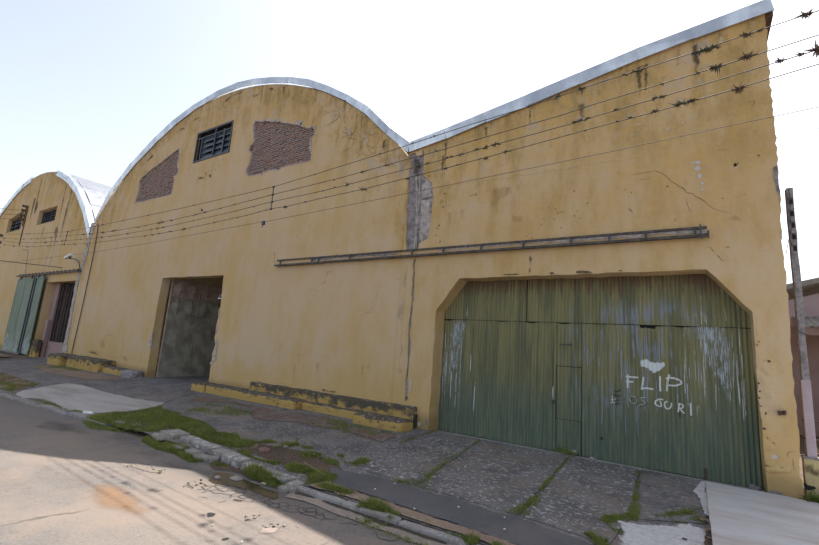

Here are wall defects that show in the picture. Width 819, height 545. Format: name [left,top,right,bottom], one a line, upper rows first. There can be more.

flaking render [245,118,316,176]
flaking render [135,149,180,204]
spalling [406,150,707,250]
crack [616,159,724,212]